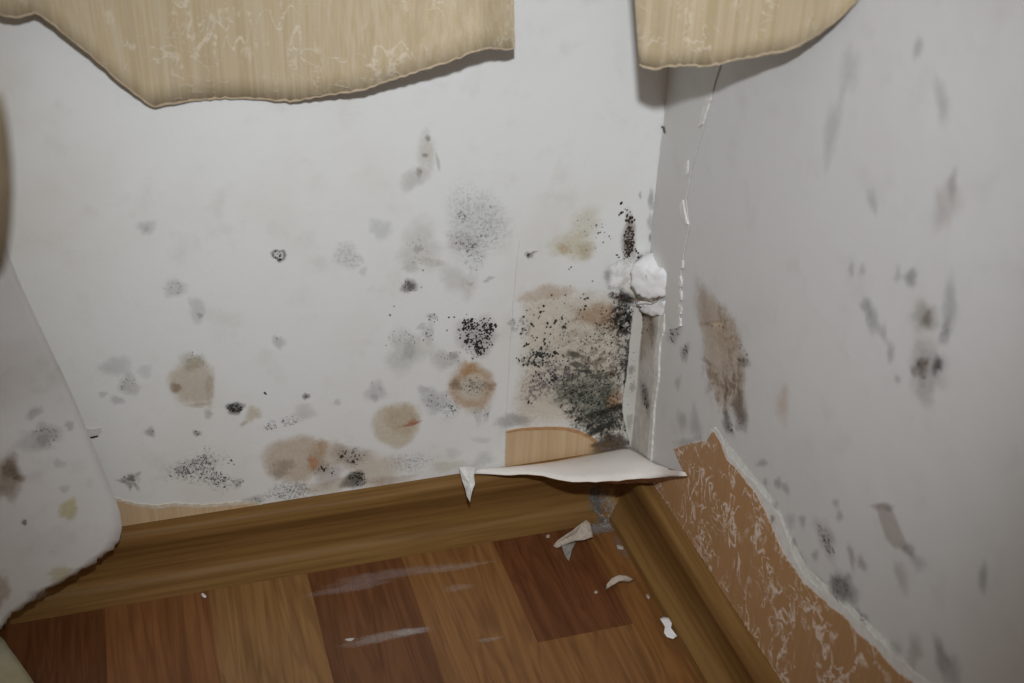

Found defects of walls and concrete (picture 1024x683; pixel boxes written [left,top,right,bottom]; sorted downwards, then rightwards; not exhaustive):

leakage [386,313,498,365]
leakage [516,285,652,451]
leakage [169,431,243,488]